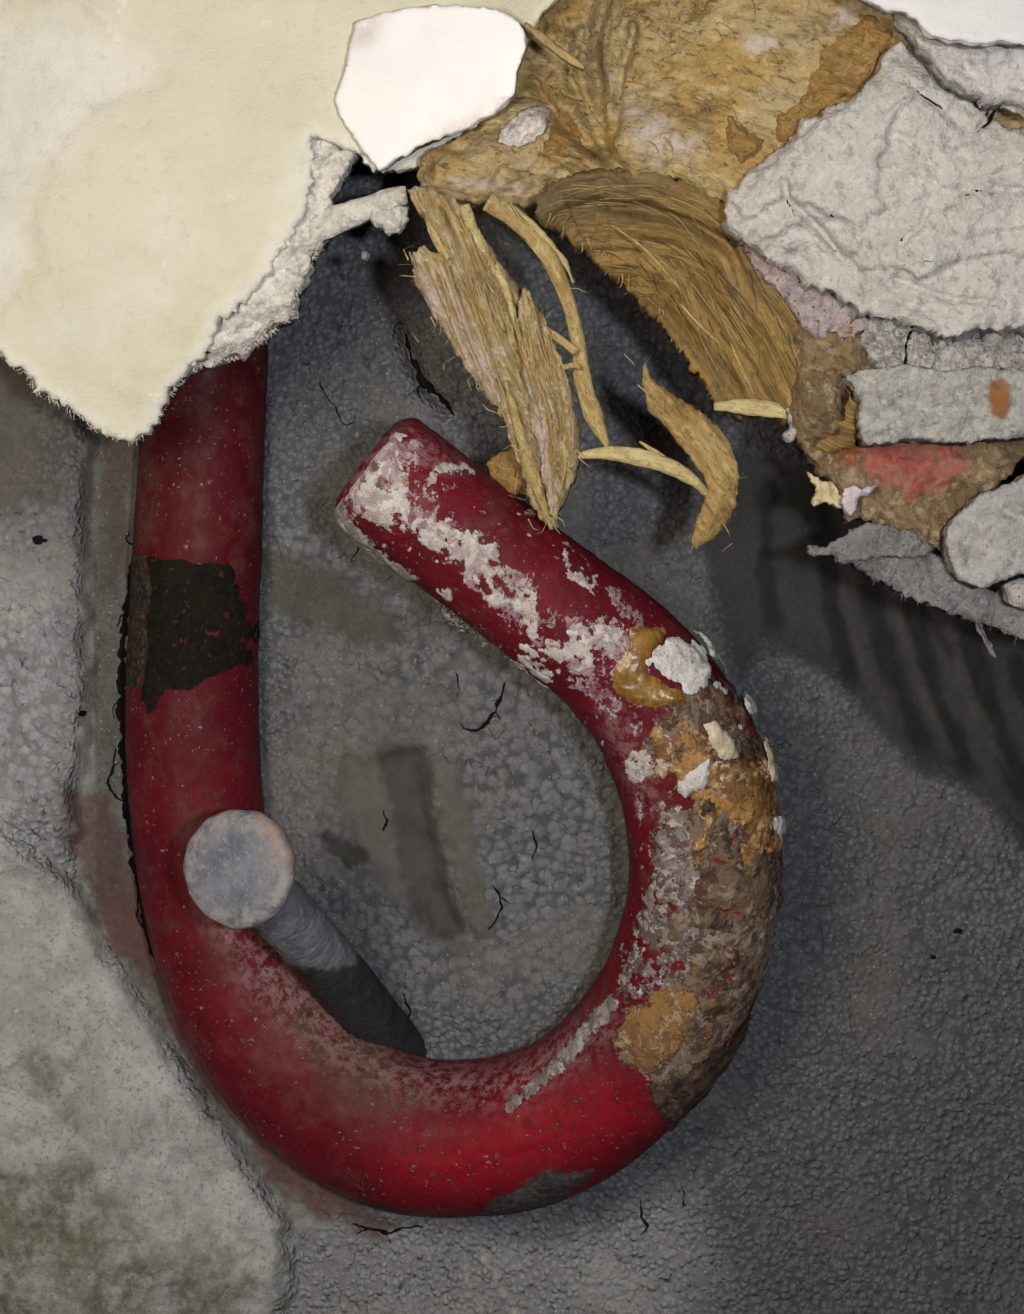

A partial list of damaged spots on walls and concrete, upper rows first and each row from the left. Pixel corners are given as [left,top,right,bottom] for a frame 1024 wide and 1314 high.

spalling [335,4,597,172]
peeling [726,15,893,165]
peeling [806,522,1024,641]
corrosion [612,678,784,1132]